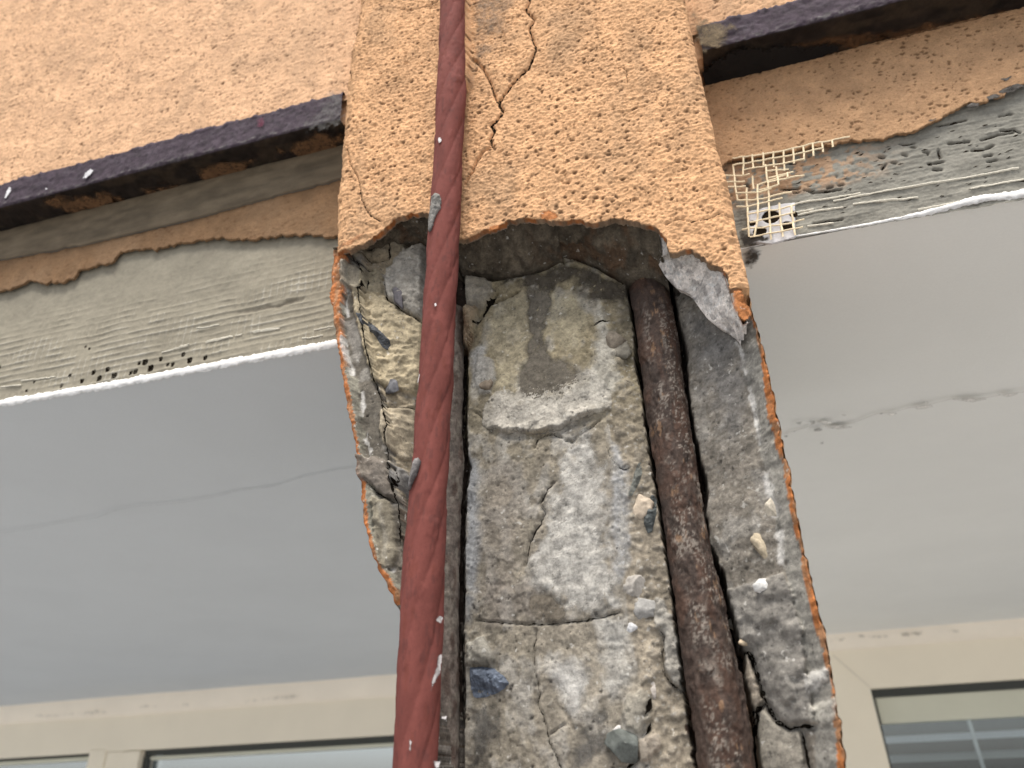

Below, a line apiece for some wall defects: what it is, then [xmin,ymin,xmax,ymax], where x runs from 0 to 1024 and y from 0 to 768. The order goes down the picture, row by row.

crack [469,0,537,169]
peeling [722,86,1024,249]
peeling [0,217,428,609]
crack [526,484,554,565]
spalling [437,210,846,768]
crack [464,613,618,766]
crack [724,599,814,768]